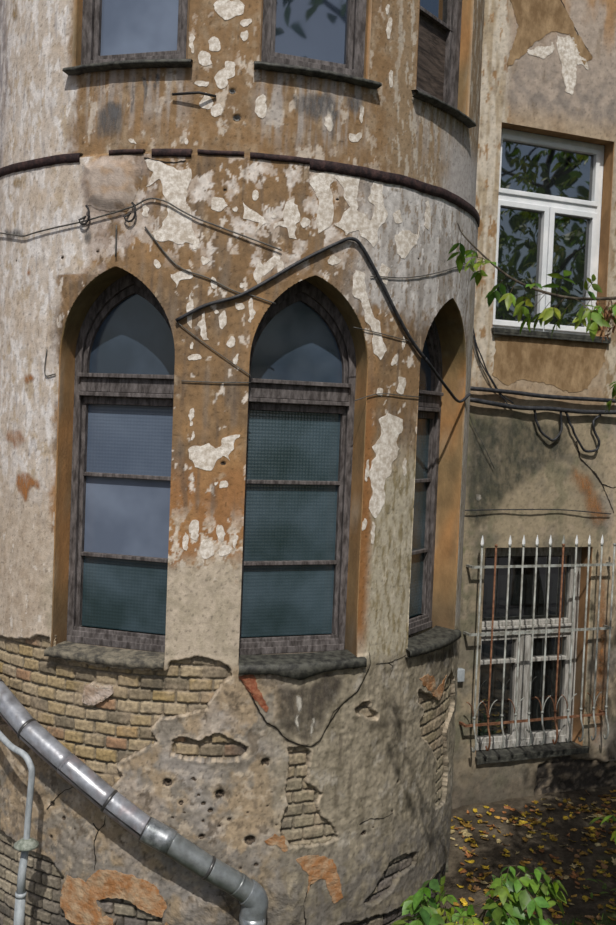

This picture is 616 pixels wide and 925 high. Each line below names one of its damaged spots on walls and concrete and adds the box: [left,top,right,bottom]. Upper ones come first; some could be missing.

spalling [0,635,269,787]